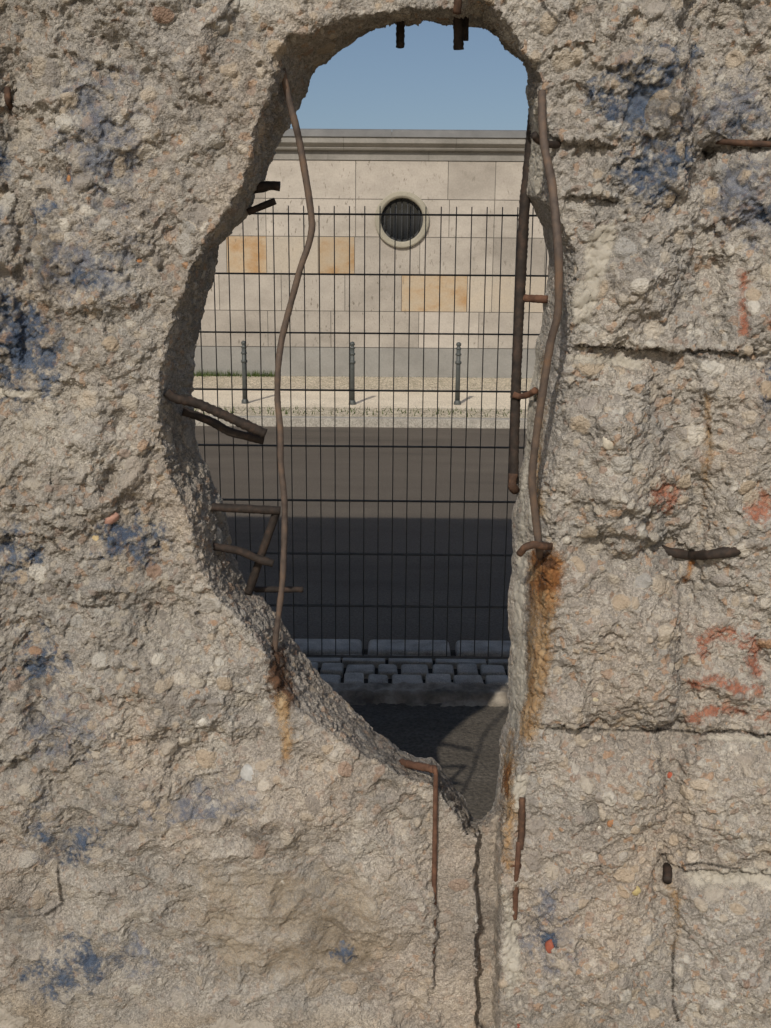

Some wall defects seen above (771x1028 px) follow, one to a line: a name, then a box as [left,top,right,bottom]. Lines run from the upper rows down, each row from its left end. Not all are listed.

spalling [396,21,405,49]
spalling [163,68,315,652]
corrosion [267,644,295,759]
corrosion [501,550,563,873]